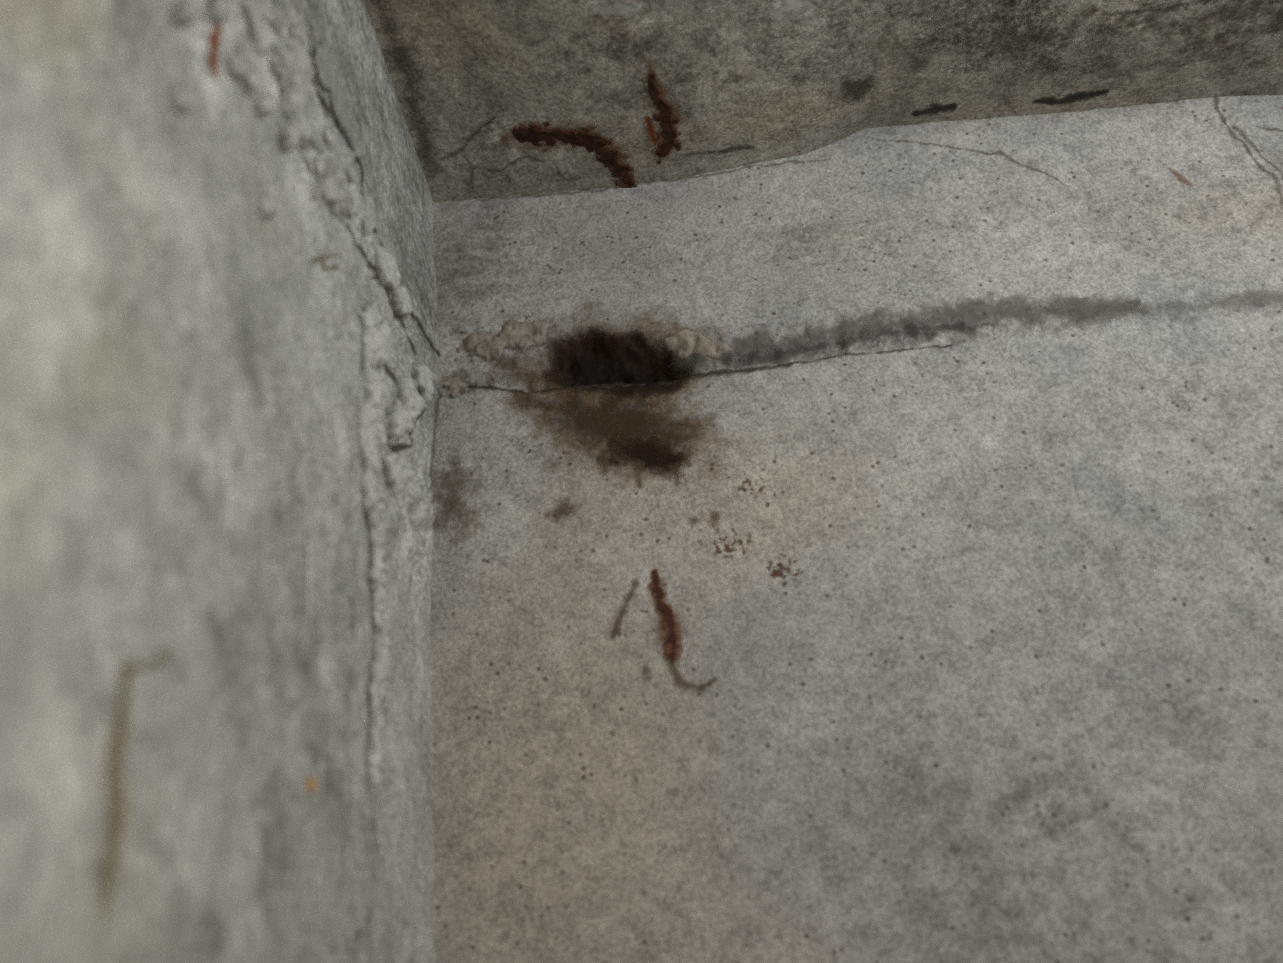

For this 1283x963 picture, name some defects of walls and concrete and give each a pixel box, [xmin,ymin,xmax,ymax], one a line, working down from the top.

rust [209,22,223,78]
rust [512,122,637,188]
rust [645,72,682,164]
crack [274,0,441,453]
damp [577,324,699,384]
crack [468,344,954,393]
damp [512,348,704,487]
rust [611,569,716,691]